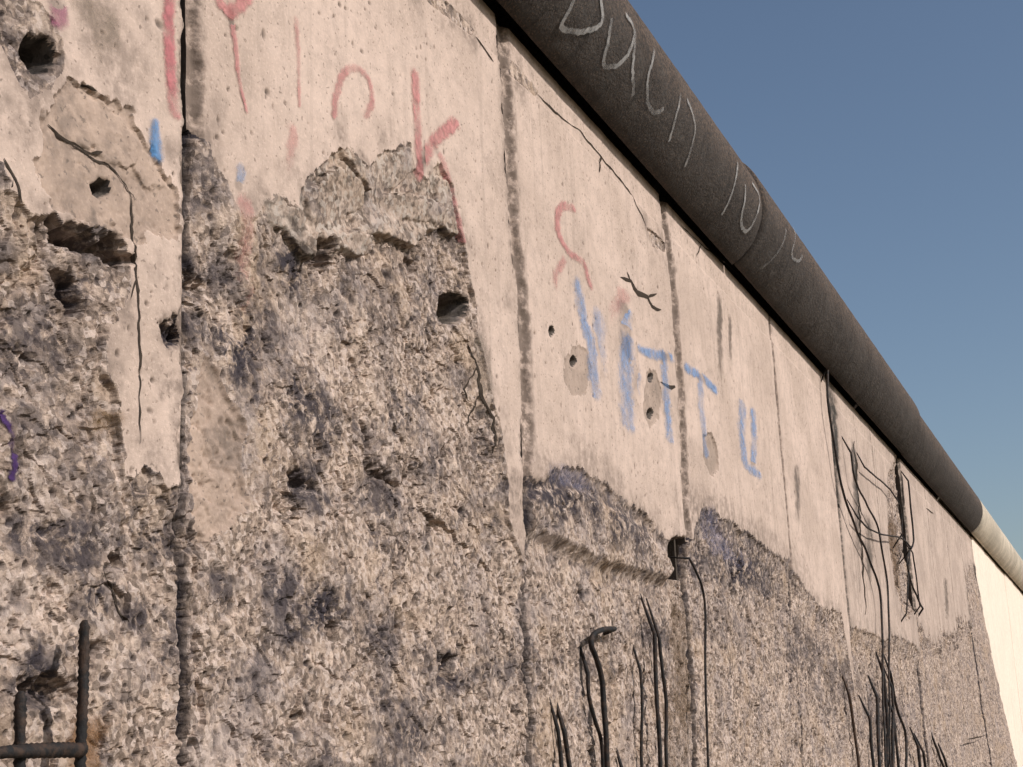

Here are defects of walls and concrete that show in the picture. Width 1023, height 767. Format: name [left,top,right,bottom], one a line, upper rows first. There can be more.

spalling [0,0,66,99]
crack [80,83,98,92]
crack [542,99,645,222]
crack [48,124,142,443]
spalling [647,227,665,252]
spalling [0,76,529,767]
spalling [523,464,683,551]
spalling [518,507,1017,767]